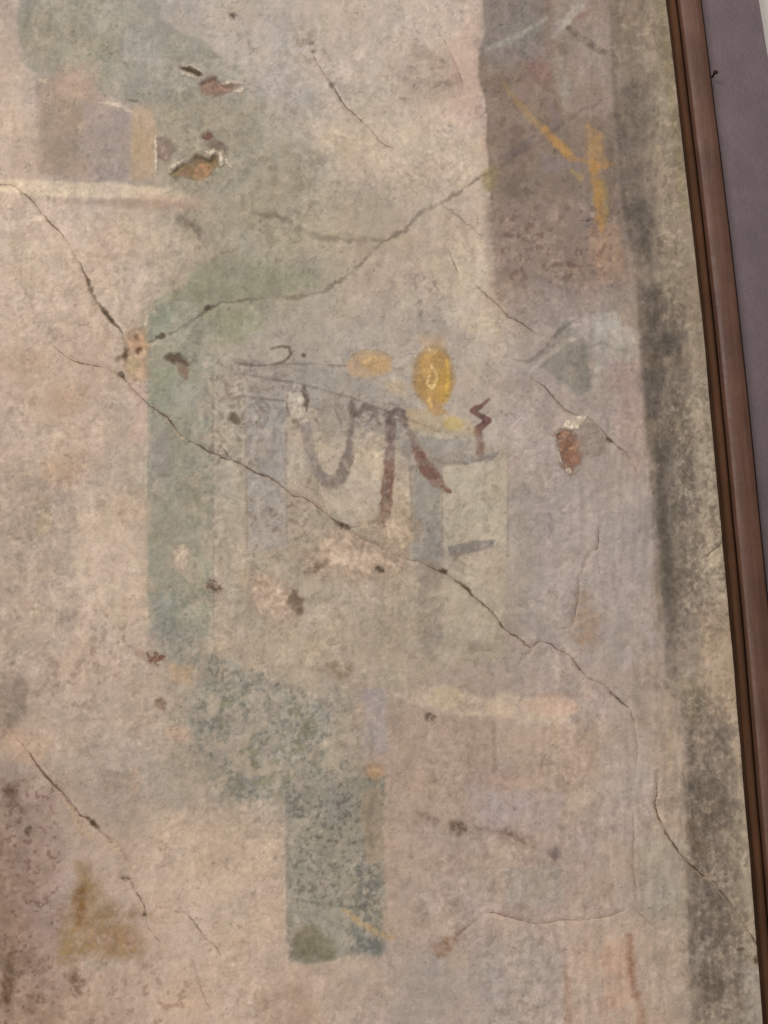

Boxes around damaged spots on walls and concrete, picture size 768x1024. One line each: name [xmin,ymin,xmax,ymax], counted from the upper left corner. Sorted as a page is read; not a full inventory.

spalling [181,65,243,96]
spalling [154,133,232,181]
crack [80,263,129,328]
crack [119,372,272,479]
spalling [556,415,604,473]
crack [440,569,524,642]
crack [75,814,146,915]
crack [654,788,723,895]